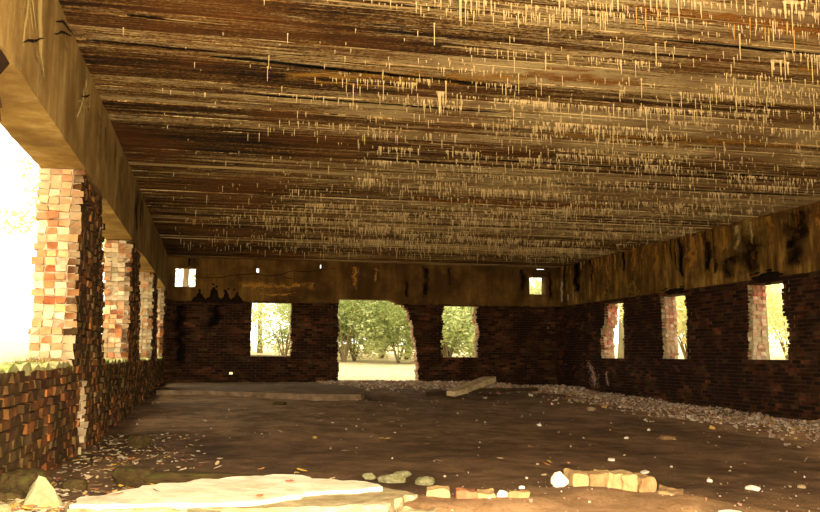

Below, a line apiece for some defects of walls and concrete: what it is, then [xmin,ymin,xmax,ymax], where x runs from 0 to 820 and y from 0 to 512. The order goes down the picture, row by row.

leakage [160,0,820,301]
rust [647,6,820,37]